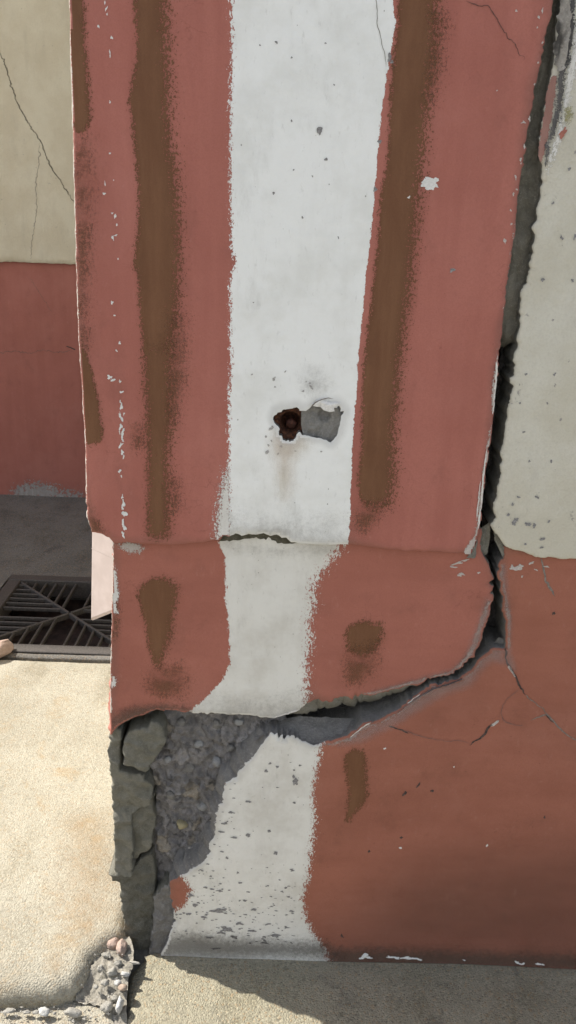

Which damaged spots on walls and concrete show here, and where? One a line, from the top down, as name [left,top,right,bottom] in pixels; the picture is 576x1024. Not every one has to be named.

crack [0,54,74,312]
peeling [421,177,439,190]
spalling [265,381,344,455]
crack [253,0,576,745]
spalling [107,709,296,955]